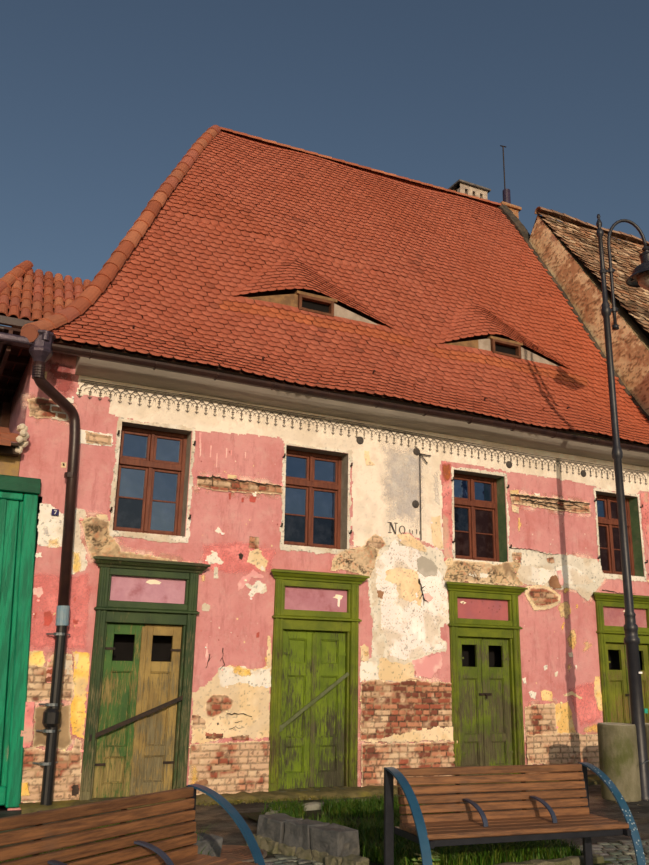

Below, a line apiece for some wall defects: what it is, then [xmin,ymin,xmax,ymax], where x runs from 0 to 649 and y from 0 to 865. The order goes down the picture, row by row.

spalling [24,392,79,424]
spalling [193,473,283,497]
spalling [510,491,591,516]
spalling [35,503,224,579]
spalling [26,650,54,707]
spalling [330,533,606,787]
spalling [52,651,90,801]
spalling [188,636,272,795]
spalling [21,744,45,803]